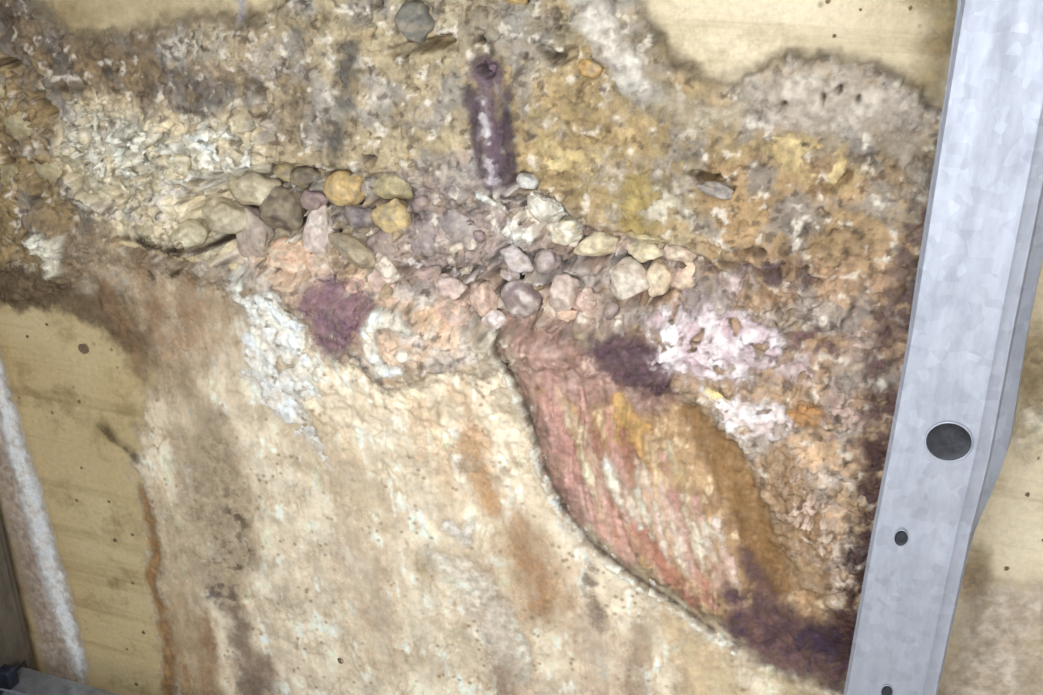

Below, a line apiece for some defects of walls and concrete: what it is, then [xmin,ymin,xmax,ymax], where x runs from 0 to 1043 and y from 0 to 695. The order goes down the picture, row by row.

leakage [66,109,256,192]
leakage [160,26,227,61]
leakage [244,50,289,79]
leakage [336,43,356,107]
leakage [417,155,466,183]
leakage [466,55,550,244]
leakage [526,0,930,236]
leakage [919,0,955,87]
leakage [0,210,926,695]
rust [469,316,842,631]